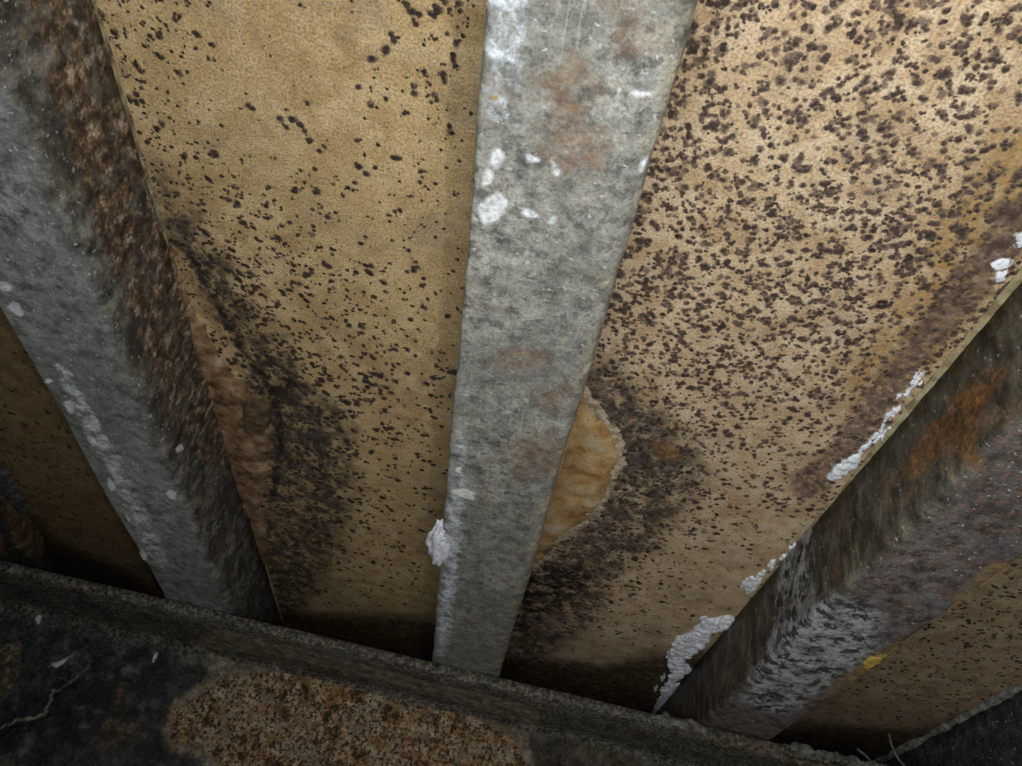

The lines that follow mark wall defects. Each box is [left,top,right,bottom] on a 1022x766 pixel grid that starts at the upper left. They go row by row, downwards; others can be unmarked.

damp [486,0,526,63]
damp [0,346,168,596]
damp [98,0,475,662]
peeling [532,386,627,571]
damp [499,0,1022,761]